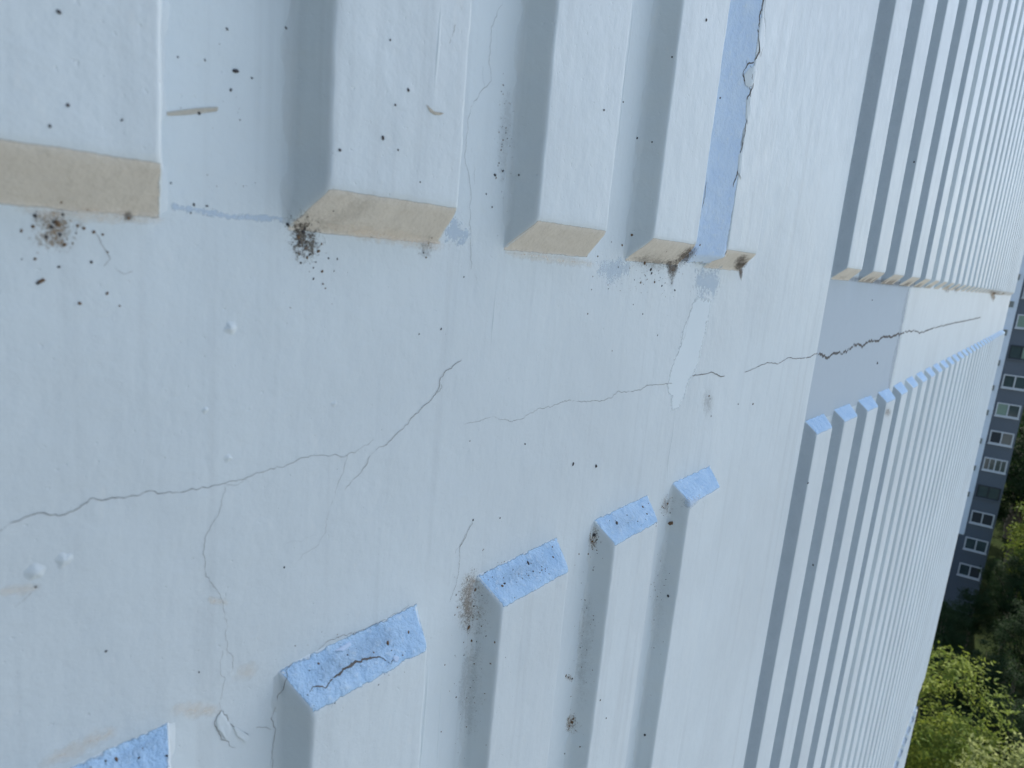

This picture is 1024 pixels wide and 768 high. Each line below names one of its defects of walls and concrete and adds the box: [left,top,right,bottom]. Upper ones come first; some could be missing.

peeling [733,0,766,187]
crack [694,317,980,377]
crack [14,361,460,682]
crack [310,656,393,691]